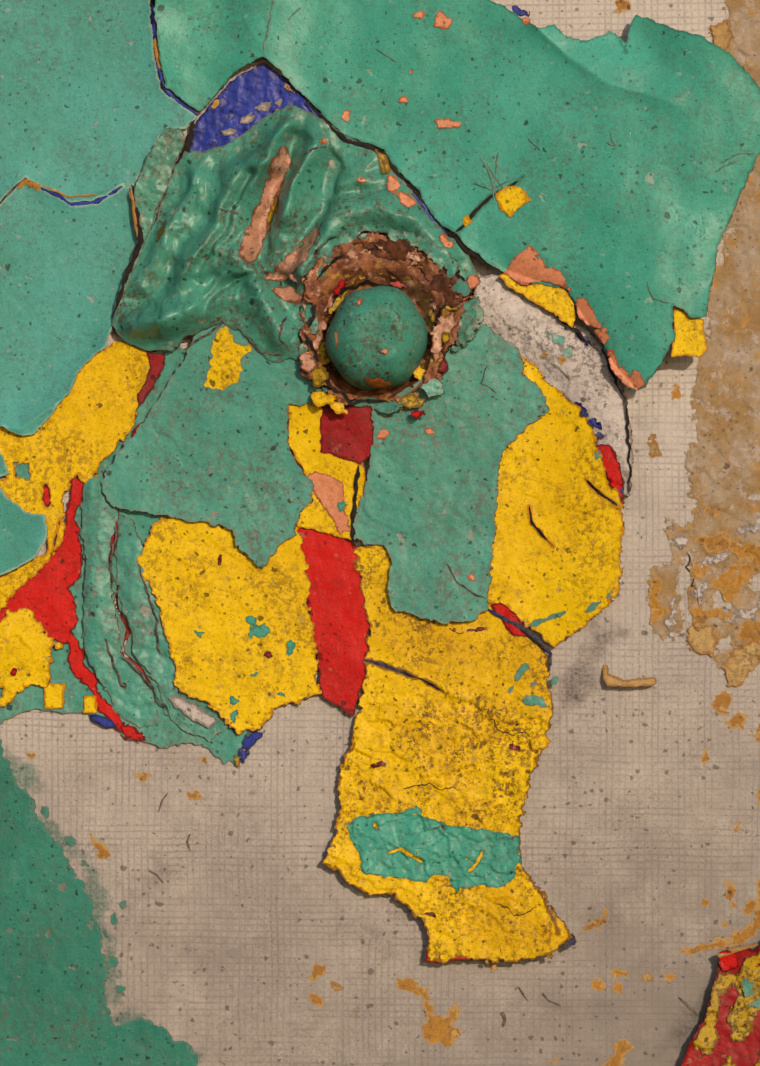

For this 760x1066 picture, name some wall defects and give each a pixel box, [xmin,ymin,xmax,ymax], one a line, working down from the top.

crack [150,0,198,116]
peeling [189,63,320,152]
peeling [710,20,734,50]
crack [0,178,144,316]
peeling [495,186,531,217]
rust [289,228,484,420]
peeling [0,273,634,767]
peeling [647,517,760,687]
crack [363,660,443,691]
peeling [602,665,657,688]
peeling [111,900,126,925]
peeling [680,943,760,1066]